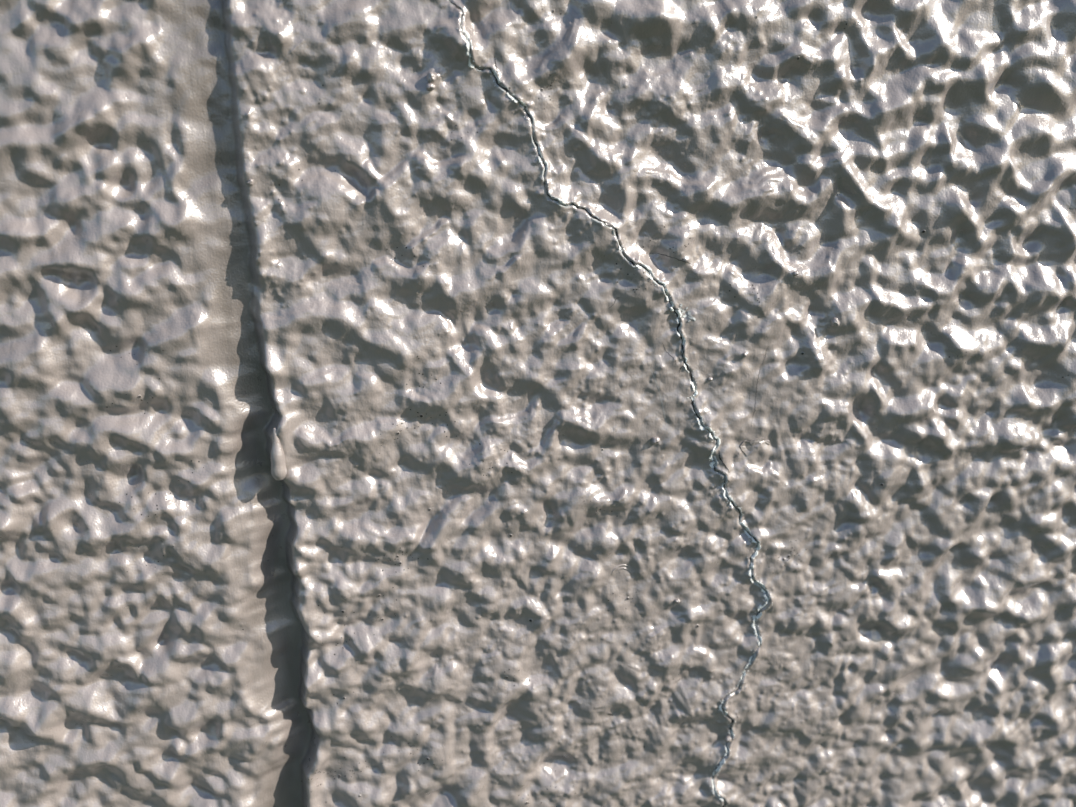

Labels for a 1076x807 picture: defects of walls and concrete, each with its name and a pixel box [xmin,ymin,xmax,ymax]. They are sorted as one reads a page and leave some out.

crack [448,0,770,807]